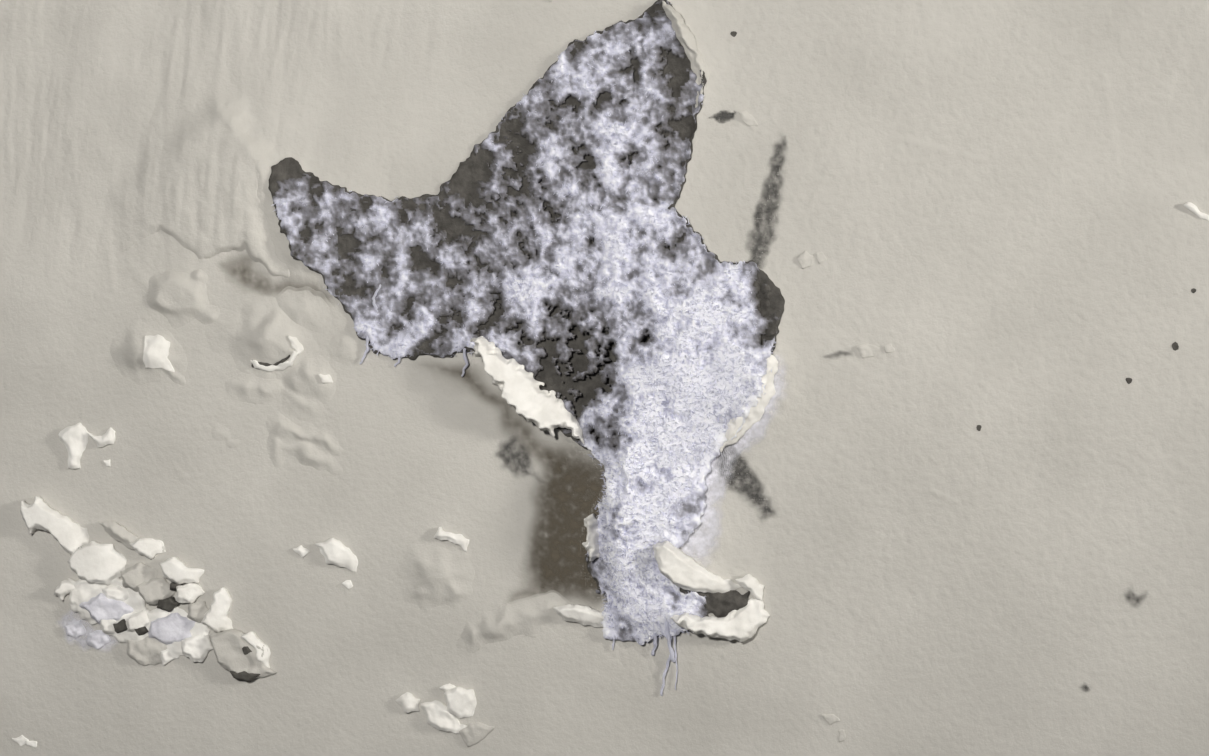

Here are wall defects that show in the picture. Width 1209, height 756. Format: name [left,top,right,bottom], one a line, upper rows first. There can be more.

peeling [268,0,785,452]
peeling [1184,202,1209,221]
peeling [58,423,115,469]
peeling [20,496,276,682]
peeling [293,538,358,589]
peeling [433,527,469,552]
peeling [553,604,604,628]
peeling [582,513,607,597]
peeling [653,541,770,642]
peeling [395,683,495,747]